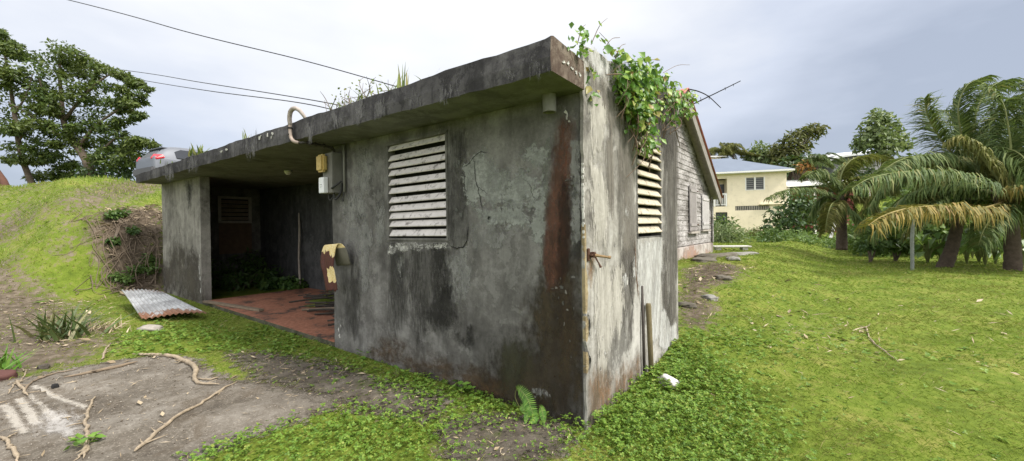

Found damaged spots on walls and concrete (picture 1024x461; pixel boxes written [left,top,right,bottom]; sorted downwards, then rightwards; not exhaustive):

crack [450,151,486,249]
peeling [420,141,550,304]
water stain [482,153,583,426]
corrosion [544,120,573,289]
water stain [591,63,680,349]